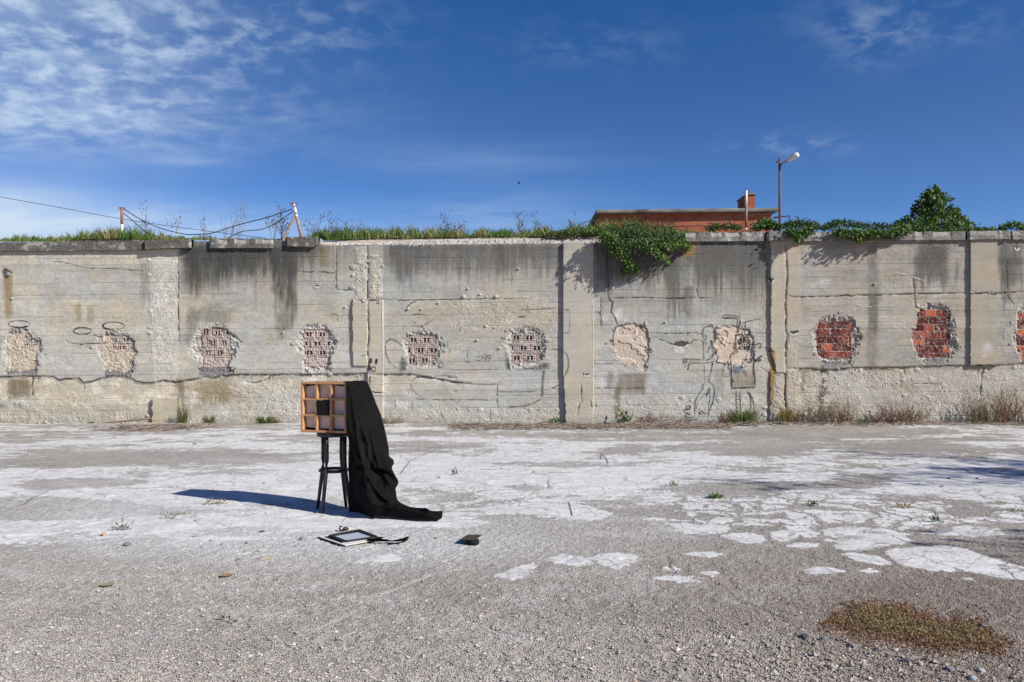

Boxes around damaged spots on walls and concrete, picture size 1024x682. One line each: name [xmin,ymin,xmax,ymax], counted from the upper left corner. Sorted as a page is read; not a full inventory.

spalling [0,324,48,376]
spalling [90,329,138,377]
spalling [147,249,243,384]
crack [0,251,530,423]
spalling [244,321,340,423]
spalling [401,295,562,370]
spalling [594,303,1024,423]